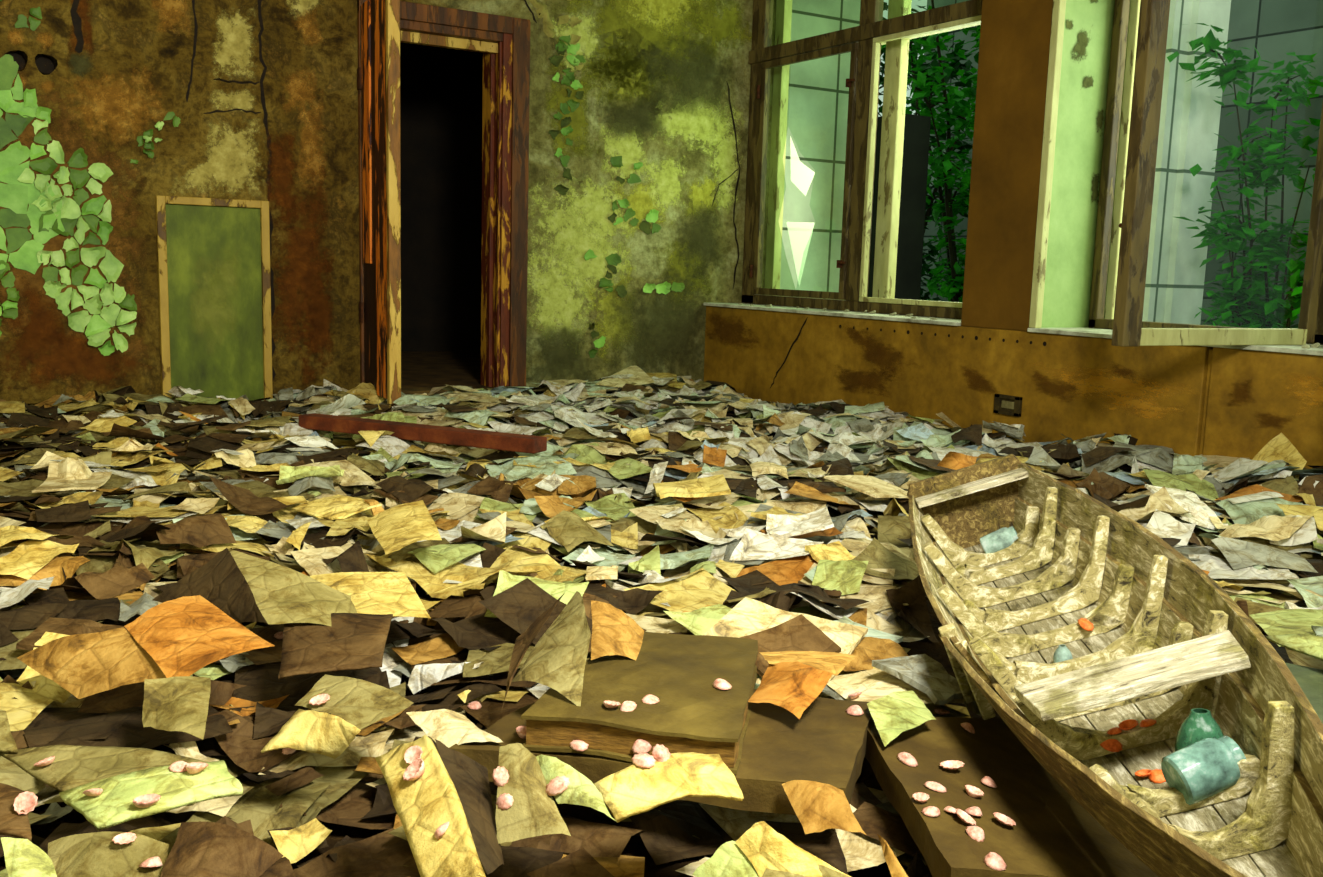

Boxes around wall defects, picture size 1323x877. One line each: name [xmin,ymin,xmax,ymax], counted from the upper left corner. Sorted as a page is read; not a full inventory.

peeling [0,7,181,373]
spalling [179,0,259,194]
crack [204,0,276,381]
corrosion [268,72,333,383]
corrosion [287,0,322,44]
damp [527,0,755,382]
crack [770,317,808,388]
damp [839,328,901,392]